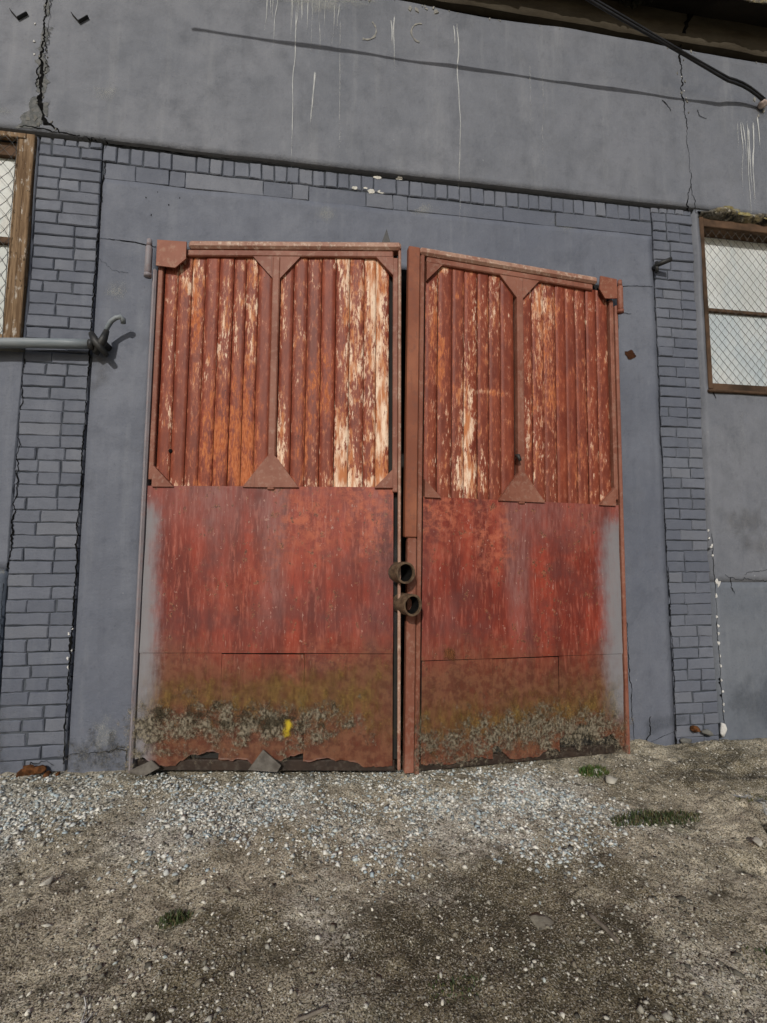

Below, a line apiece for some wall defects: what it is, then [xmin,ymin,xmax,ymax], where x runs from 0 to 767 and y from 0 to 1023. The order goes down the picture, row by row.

leakage [291,0,341,130]
crack [19,0,699,765]